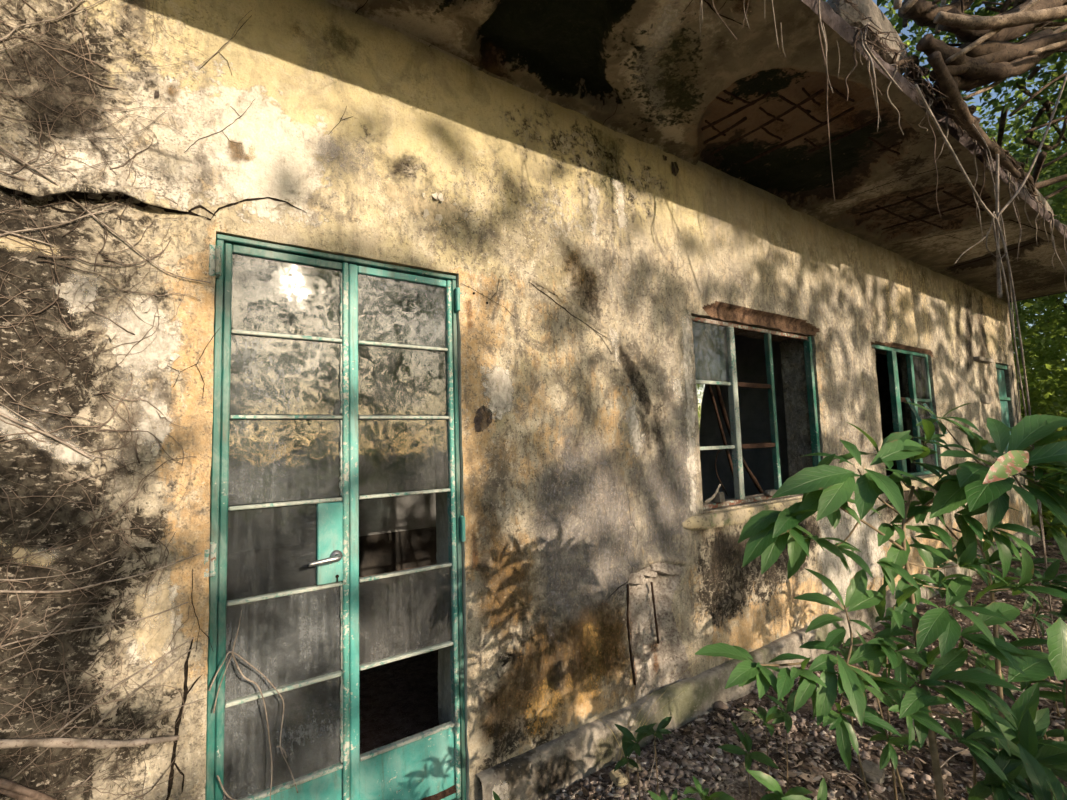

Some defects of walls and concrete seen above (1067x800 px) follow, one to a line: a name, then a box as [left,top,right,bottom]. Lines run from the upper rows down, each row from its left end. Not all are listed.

damp [0,28,106,155]
spalling [473,0,634,111]
crack [0,164,305,220]
damp [589,134,627,240]
damp [610,318,696,551]
crack [166,569,213,800]
damp [478,437,639,760]
spalling [625,562,690,701]
damp [706,533,750,625]